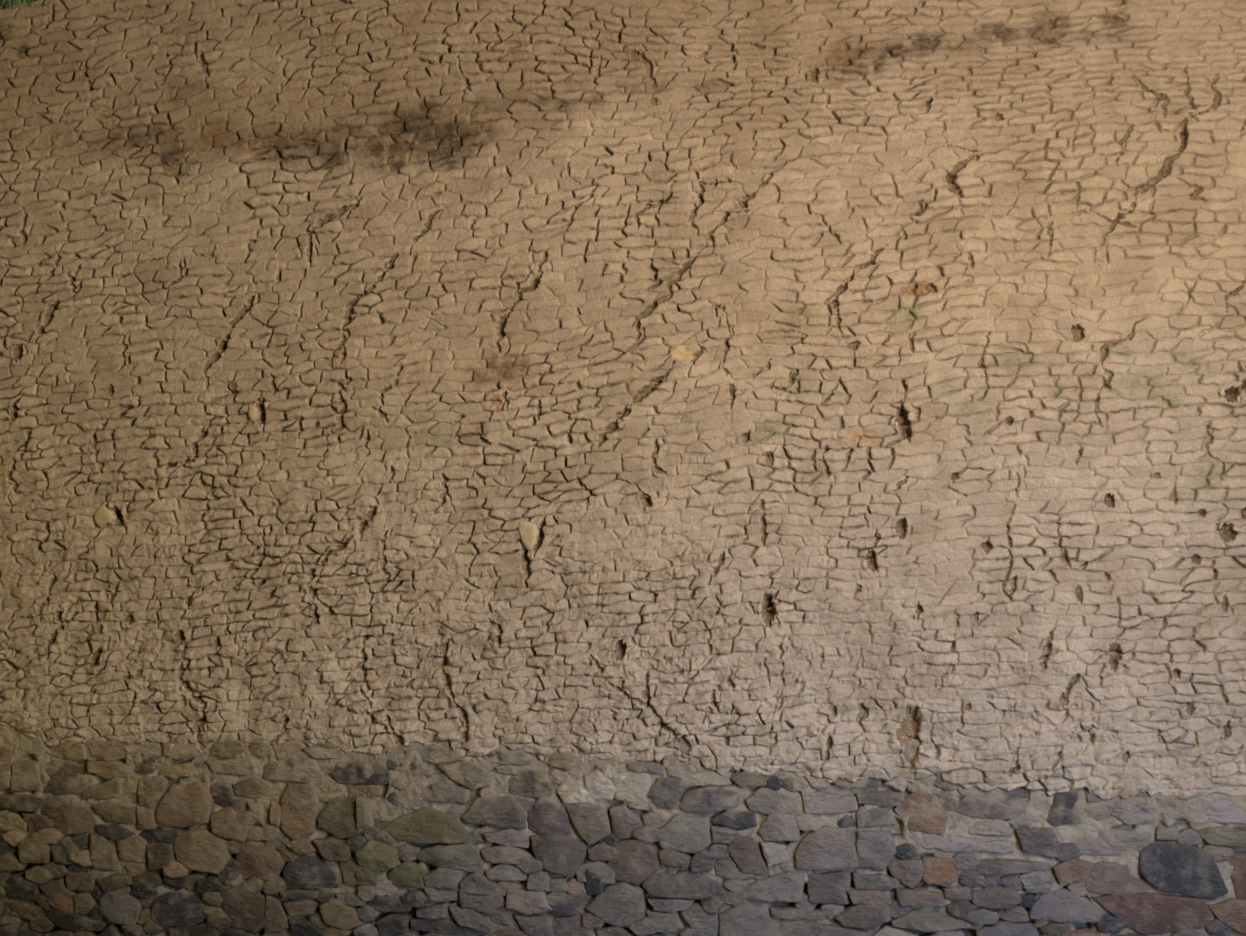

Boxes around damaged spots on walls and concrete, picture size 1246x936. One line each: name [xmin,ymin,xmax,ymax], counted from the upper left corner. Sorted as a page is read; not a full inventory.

crack [925,100,979,197]
crack [1101,69,1246,262]
crack [167,271,281,499]
crack [298,211,439,483]
crack [495,254,548,351]
crack [598,304,804,447]
crack [634,154,773,339]
crack [834,202,923,332]
crack [1075,318,1145,463]
crack [308,508,391,618]
crack [438,641,469,748]
crack [592,657,687,755]